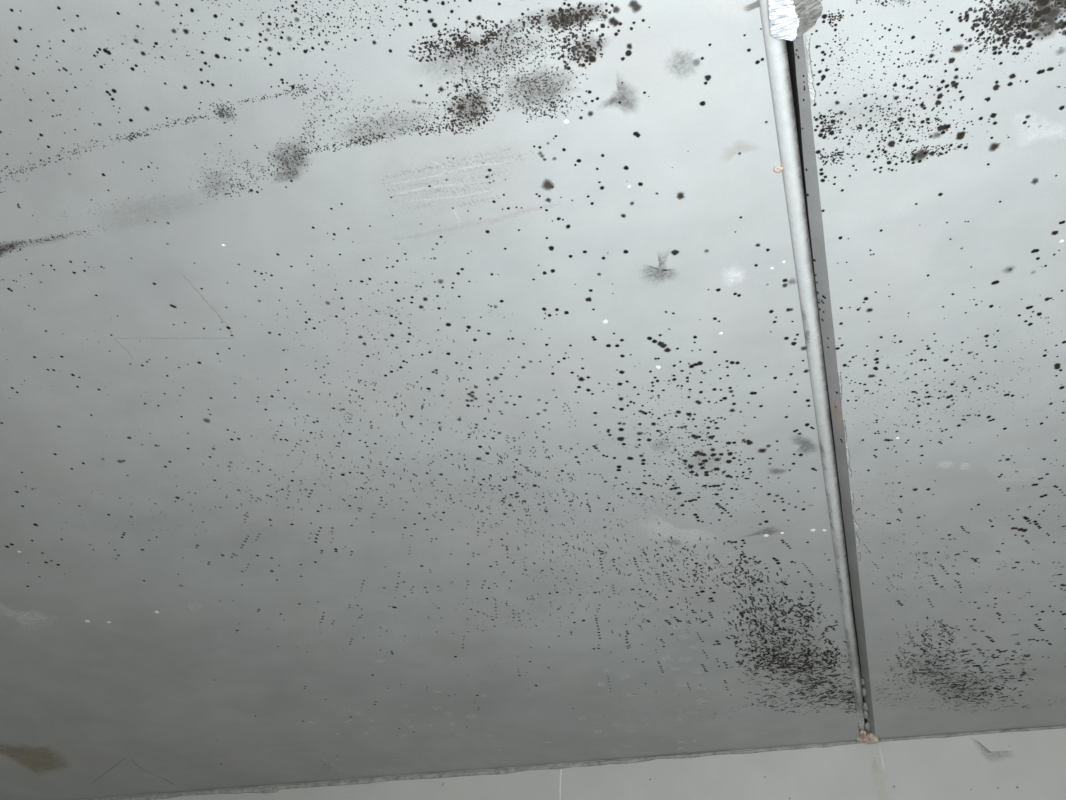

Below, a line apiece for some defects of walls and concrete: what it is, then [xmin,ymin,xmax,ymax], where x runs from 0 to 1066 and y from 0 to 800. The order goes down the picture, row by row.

damp [0,0,650,205]
damp [0,227,106,260]
damp [536,180,573,229]
damp [835,330,1066,467]
damp [203,243,856,715]
damp [989,458,1066,570]
damp [864,515,1066,708]